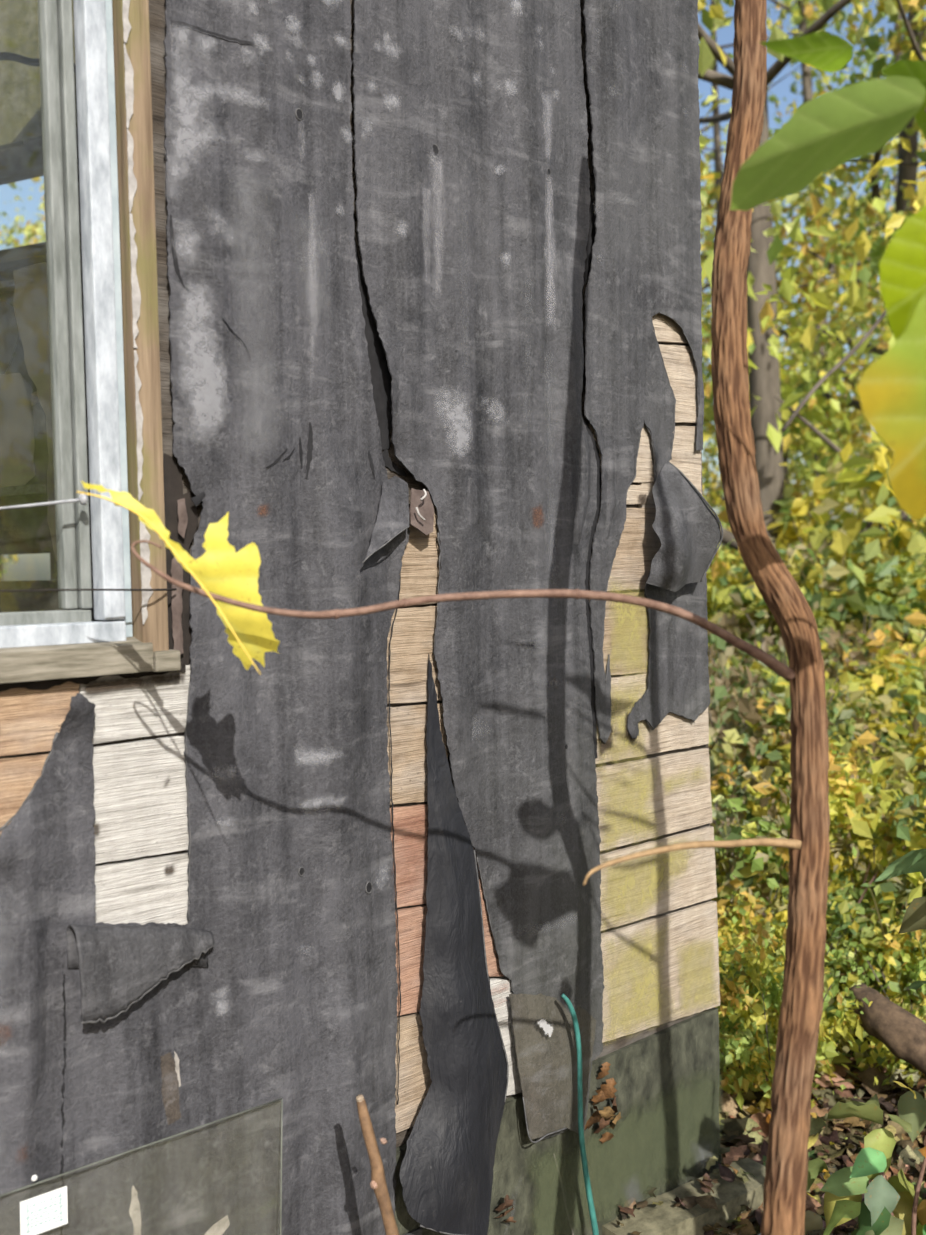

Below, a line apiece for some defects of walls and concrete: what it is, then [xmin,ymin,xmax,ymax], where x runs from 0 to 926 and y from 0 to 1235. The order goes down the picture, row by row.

peeling [122,0,143,501]
crack [353,213,406,479]
crack [582,145,596,299]
peeling [0,453,198,925]
peeling [362,312,723,1235]
crack [583,419,601,758]